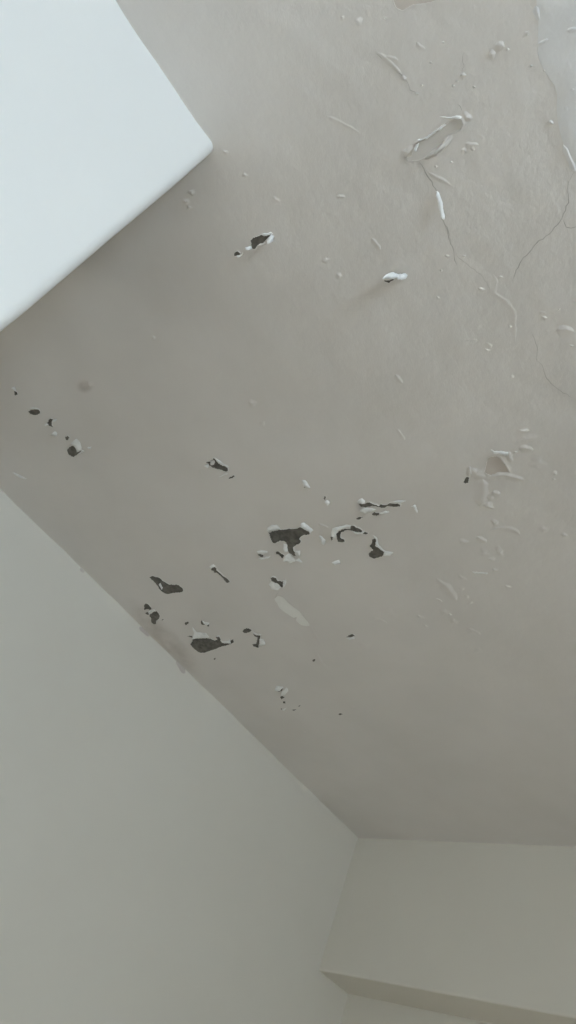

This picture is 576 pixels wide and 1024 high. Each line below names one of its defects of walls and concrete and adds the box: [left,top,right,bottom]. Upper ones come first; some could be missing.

peeling [401,105,479,163]
peeling [233,232,274,258]
peeling [382,272,408,284]
crack [419,161,575,397]
peeling [28,407,91,457]
peeling [199,456,236,479]
peeling [257,498,418,563]
peeling [149,575,184,594]
peeling [210,564,231,583]
peeling [184,619,265,660]